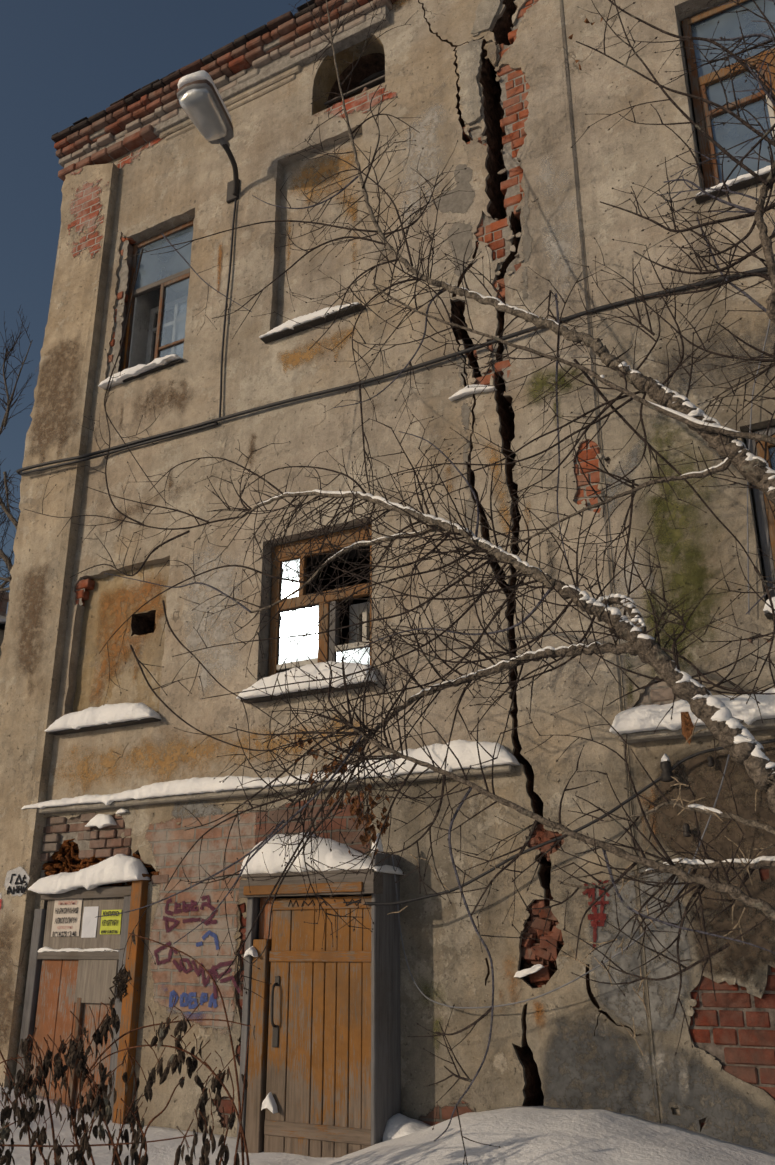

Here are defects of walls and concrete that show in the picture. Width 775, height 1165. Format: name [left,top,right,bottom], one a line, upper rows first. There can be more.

flaking render [308,86,397,124]
flaking render [66,167,109,260]
flaking render [107,233,136,378]
damp [32,342,78,462]
crack [418,0,551,906]
flaking render [573,414,667,517]
flaking render [40,788,370,1063]
crack [483,958,491,986]
flaking render [543,739,775,1154]
crack [514,1004,544,1106]